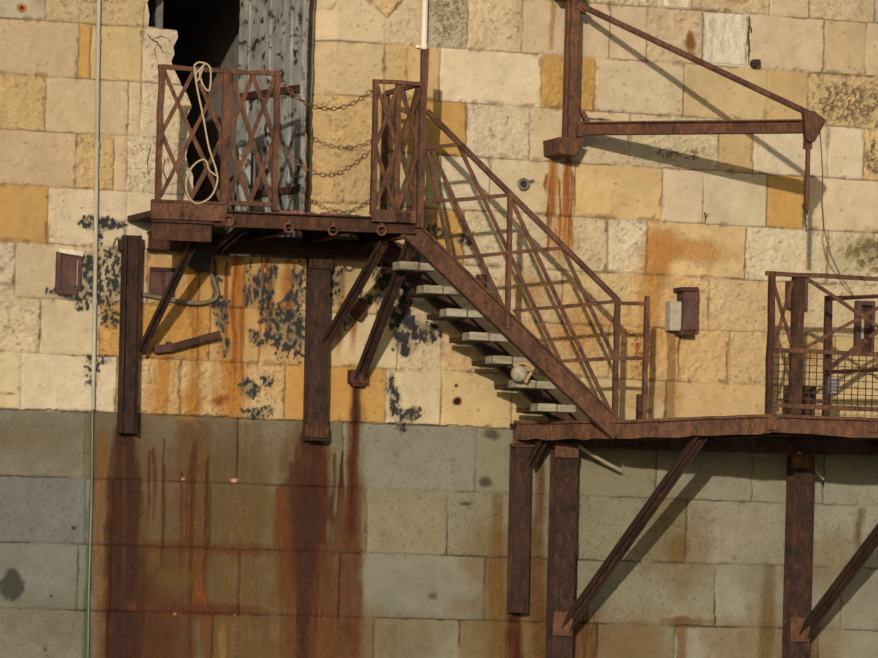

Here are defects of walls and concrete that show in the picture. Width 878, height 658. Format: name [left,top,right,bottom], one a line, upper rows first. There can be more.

crack [147,33,170,62]
rust [686,31,696,55]
rust [543,157,575,254]
rust [92,256,363,658]
water stain [0,569,24,601]